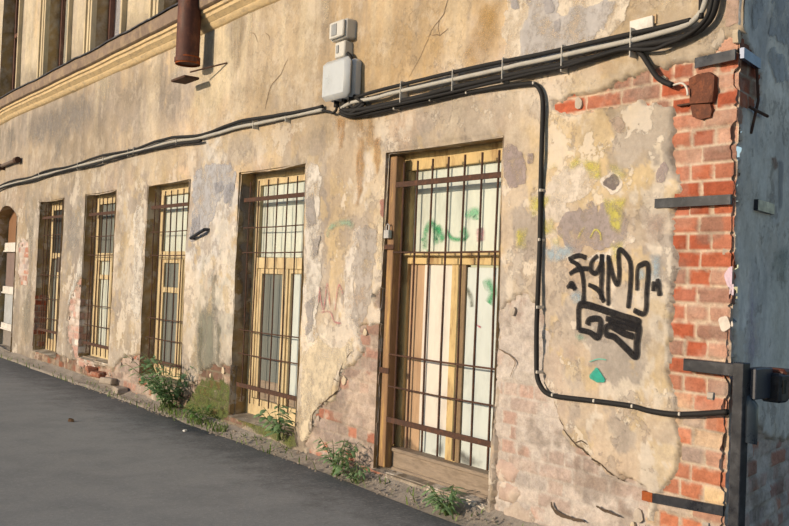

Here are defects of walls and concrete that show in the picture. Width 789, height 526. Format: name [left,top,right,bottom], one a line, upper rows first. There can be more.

corrosion [175,54,200,68]
crack [410,0,448,75]
peeling [752,0,789,83]
flaking render [18,238,29,285]
flaking render [494,0,760,526]
flaking render [32,258,153,397]
flaking render [299,164,387,476]
crack [311,353,350,430]
flaking render [745,434,789,526]